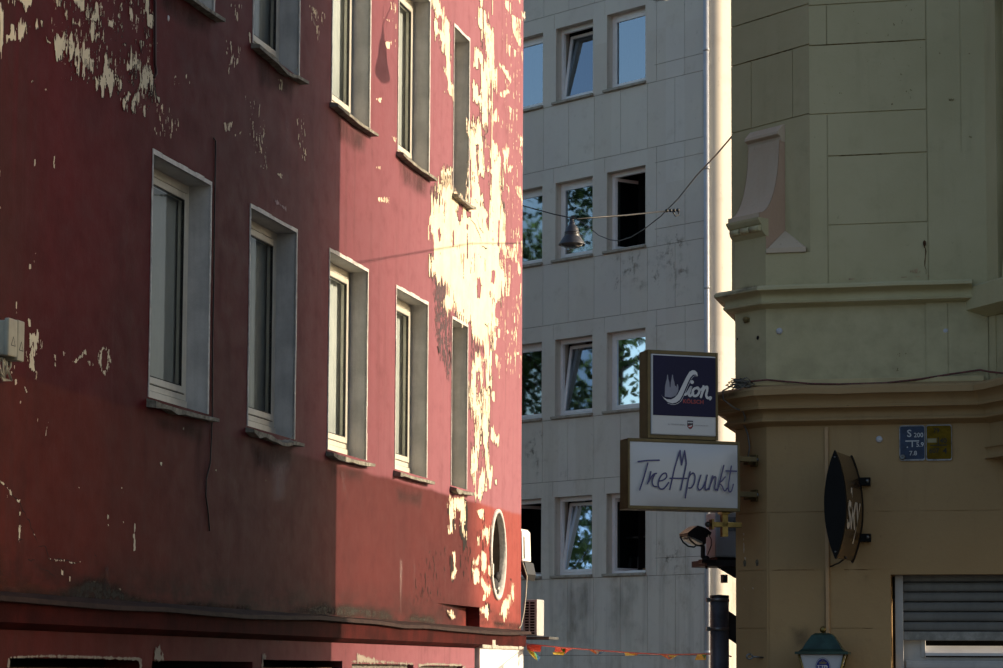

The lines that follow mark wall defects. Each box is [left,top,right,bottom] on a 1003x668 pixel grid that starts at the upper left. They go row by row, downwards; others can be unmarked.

peeling [0,0,179,135]
peeling [224,122,283,179]
peeling [26,318,42,380]
peeling [428,0,525,623]